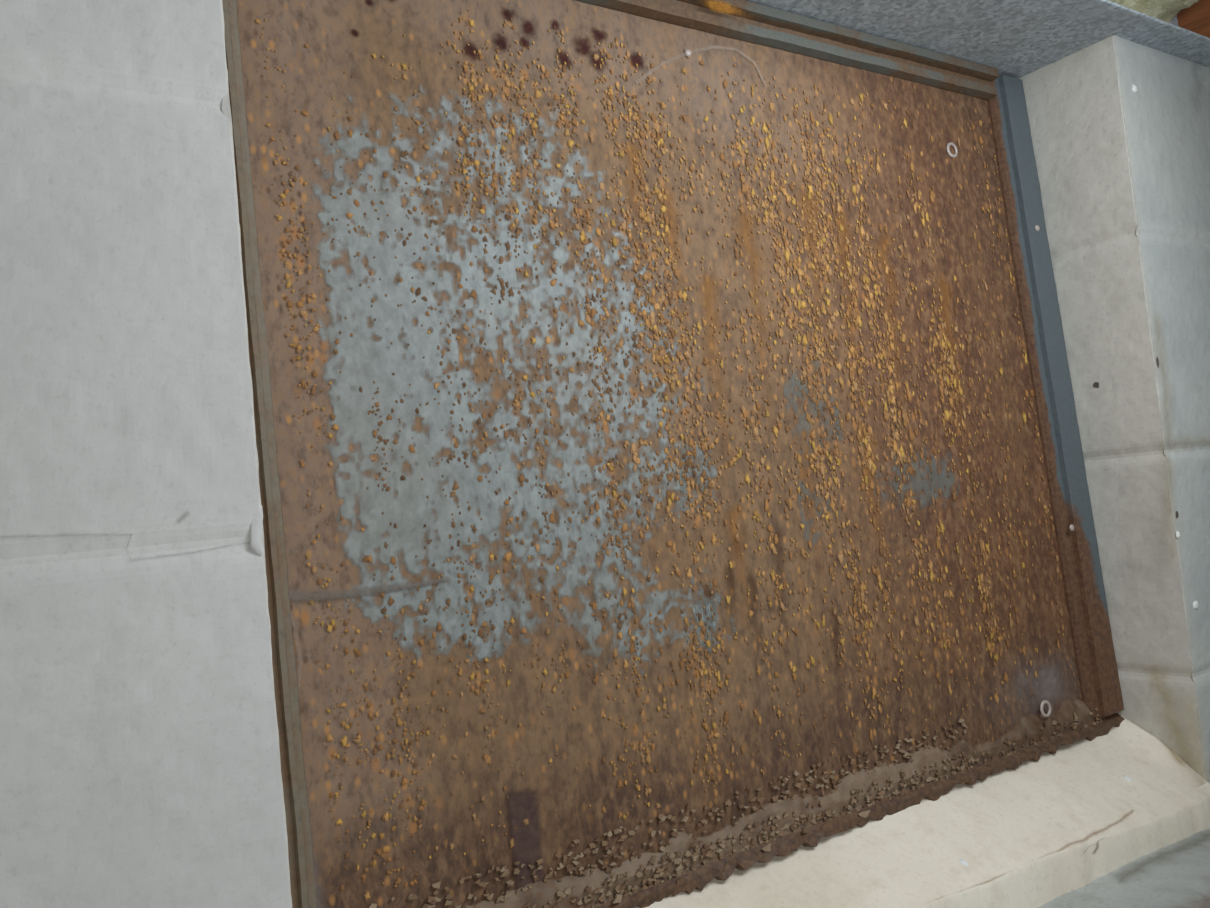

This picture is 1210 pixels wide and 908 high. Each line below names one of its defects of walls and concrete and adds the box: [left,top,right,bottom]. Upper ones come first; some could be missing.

corrosion [709,1,733,12]
peeling [314,89,720,666]
corrosion [267,9,1105,908]
peeling [882,451,956,506]